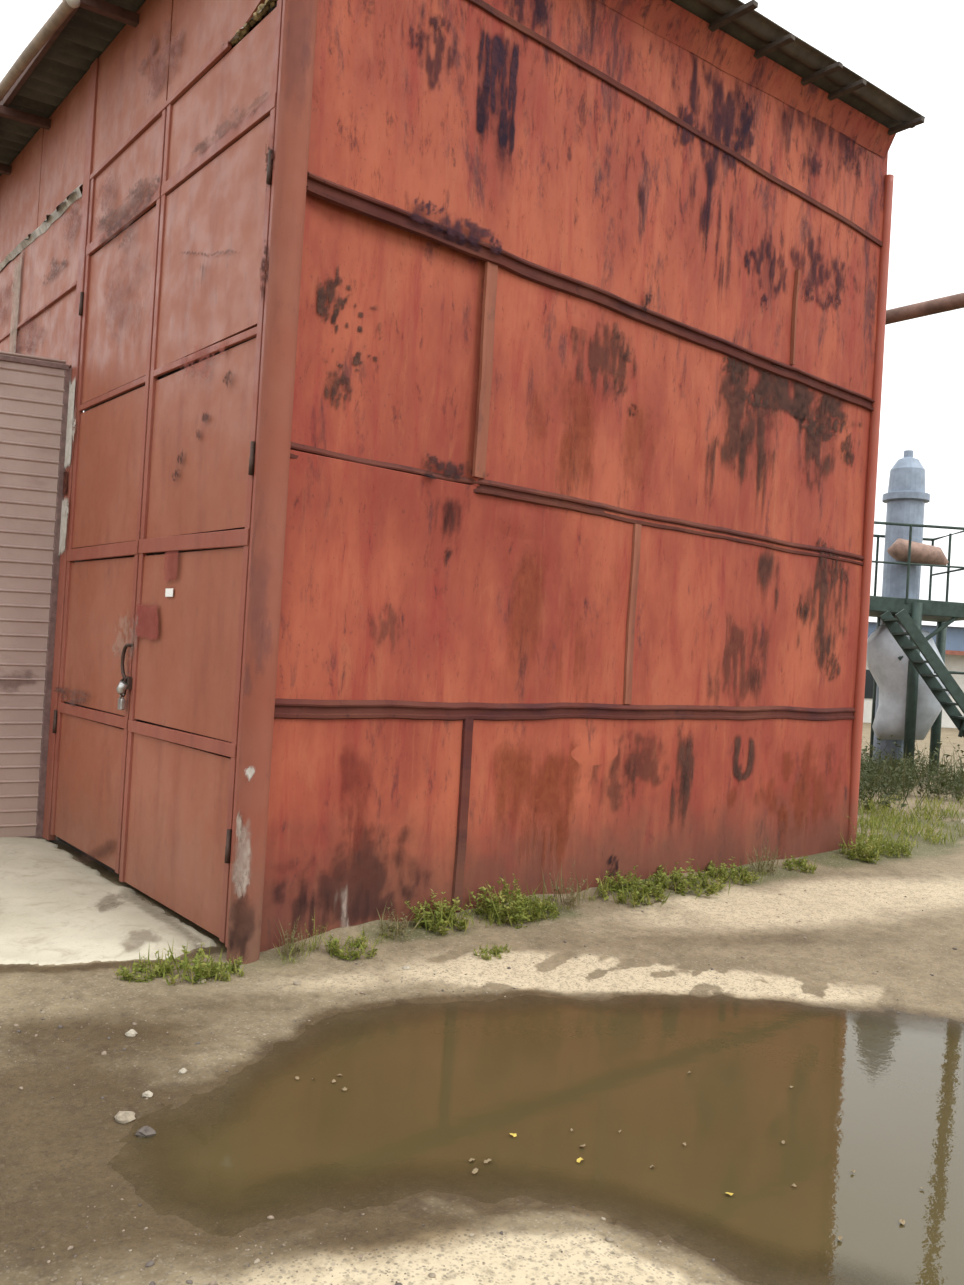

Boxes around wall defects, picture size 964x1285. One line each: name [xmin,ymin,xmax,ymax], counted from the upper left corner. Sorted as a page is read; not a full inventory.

spalling [223,0,277,51]
peeling [0,186,82,353]
peeling [64,379,76,468]
peeling [59,498,69,554]
peeling [233,814,250,897]